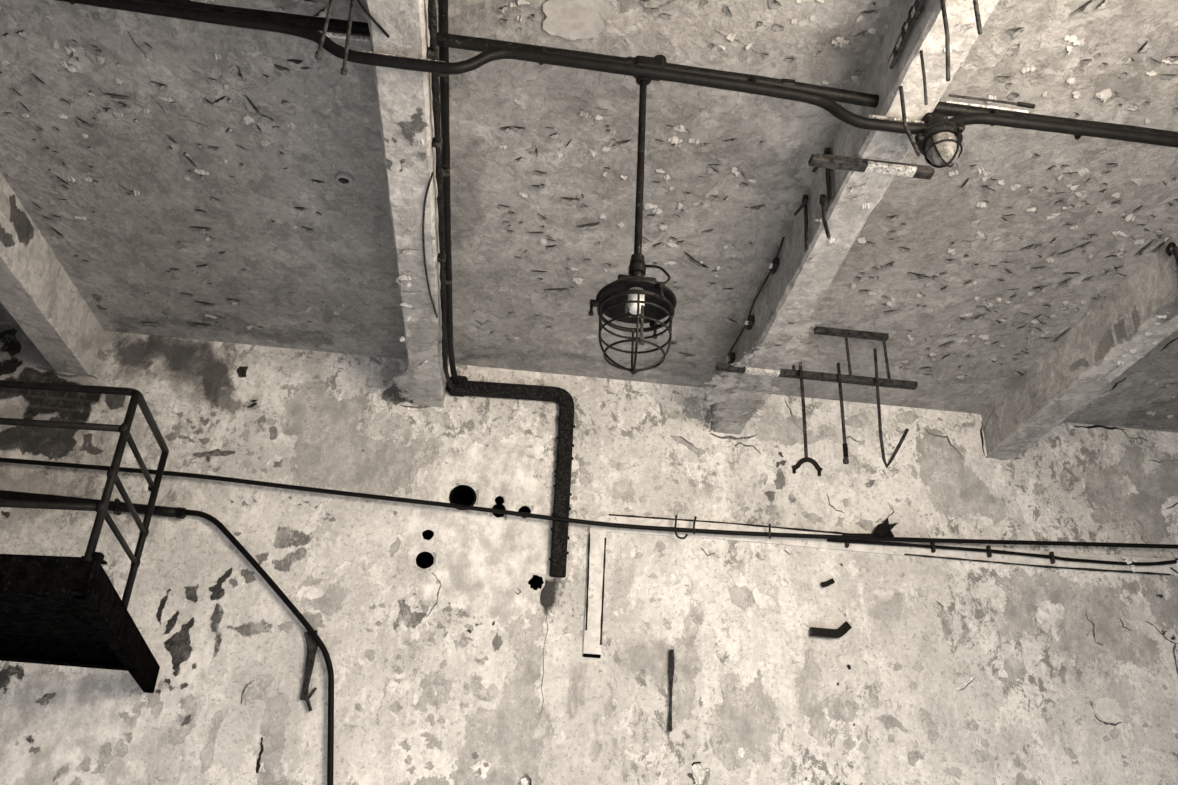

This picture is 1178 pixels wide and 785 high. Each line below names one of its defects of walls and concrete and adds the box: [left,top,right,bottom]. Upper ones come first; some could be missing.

peeling [709,29,770,59]
peeling [756,18,796,32]
peeling [796,0,888,90]
peeling [0,39,208,247]
peeling [163,53,320,181]
peeling [190,197,227,256]
peeling [116,292,346,346]
spalling [0,328,126,475]
damp [114,336,246,413]
peeling [53,527,352,785]
crack [1145,621,1178,674]